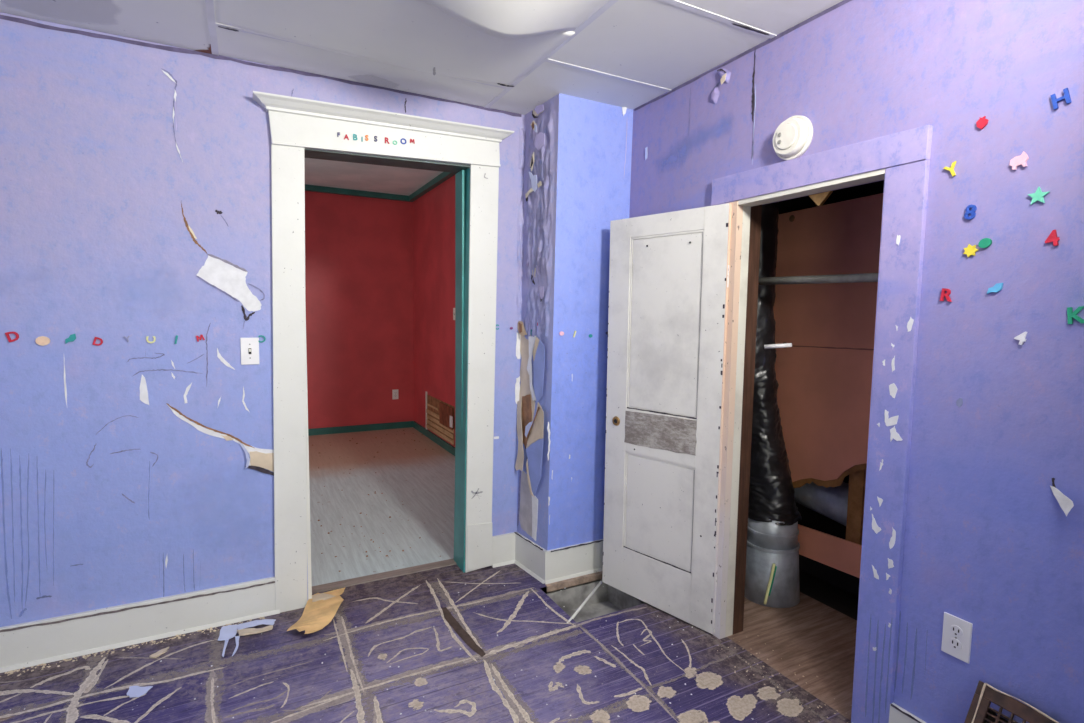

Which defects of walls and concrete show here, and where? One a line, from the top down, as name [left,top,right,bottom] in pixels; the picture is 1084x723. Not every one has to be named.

crack [624,0,852,175]
peeling [525,105,545,201]
peeling [197,254,265,327]
crack [792,343,874,351]
peeling [882,343,898,398]
peeling [166,383,274,476]
peeling [877,410,902,441]
peeling [870,497,896,594]